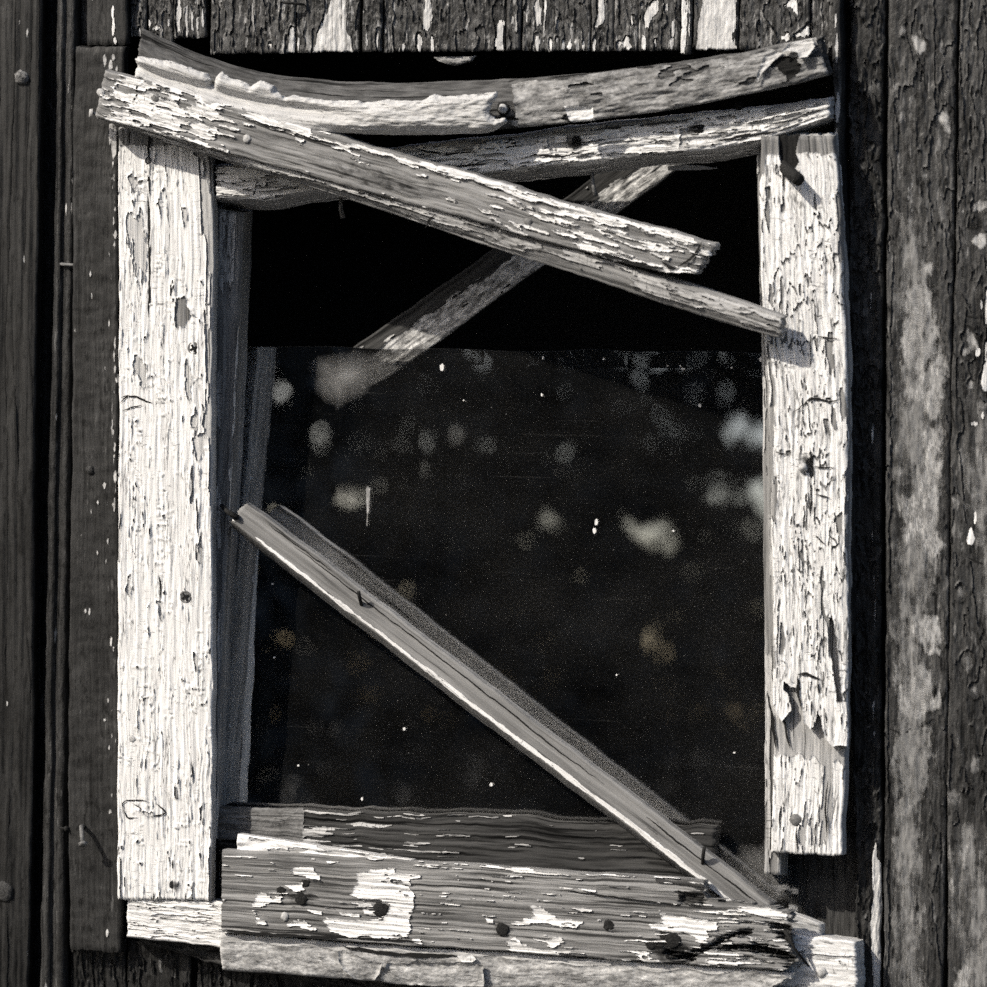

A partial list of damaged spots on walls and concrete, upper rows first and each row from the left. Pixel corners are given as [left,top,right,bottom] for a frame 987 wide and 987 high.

peeling [313,0,353,53]
peeling [417,0,434,52]
peeling [526,0,605,51]
peeling [618,0,737,54]
peeling [757,26,815,82]
peeling [564,106,595,122]
peeling [174,297,190,328]
crack [793,397,838,412]
crack [776,447,838,546]
peeling [960,332,987,614]
peeling [870,217,948,987]
spalling [664,923,796,963]